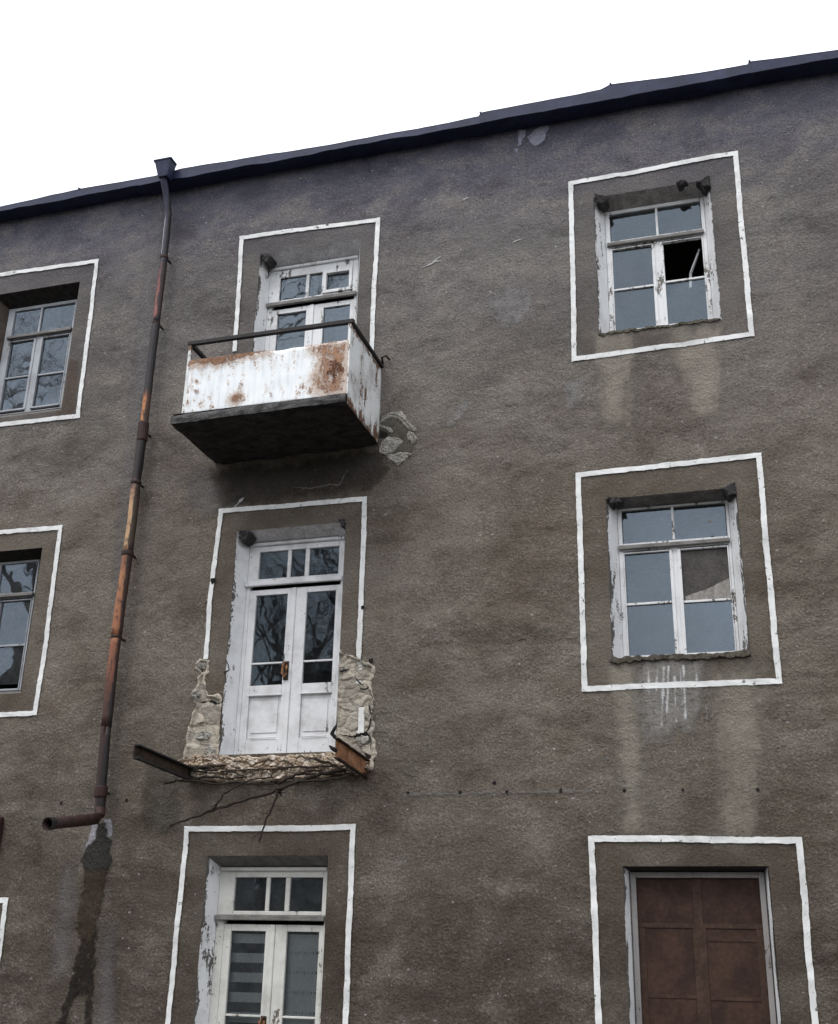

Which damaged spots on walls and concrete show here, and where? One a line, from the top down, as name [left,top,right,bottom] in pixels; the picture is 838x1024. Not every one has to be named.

peeling [514,125,549,192]
rust [188,350,268,369]
rust [228,383,244,405]
rust [306,340,349,396]
flaking render [377,411,417,466]
flaking render [178,649,377,783]
leakage [605,659,767,837]
leakage [56,819,113,1024]